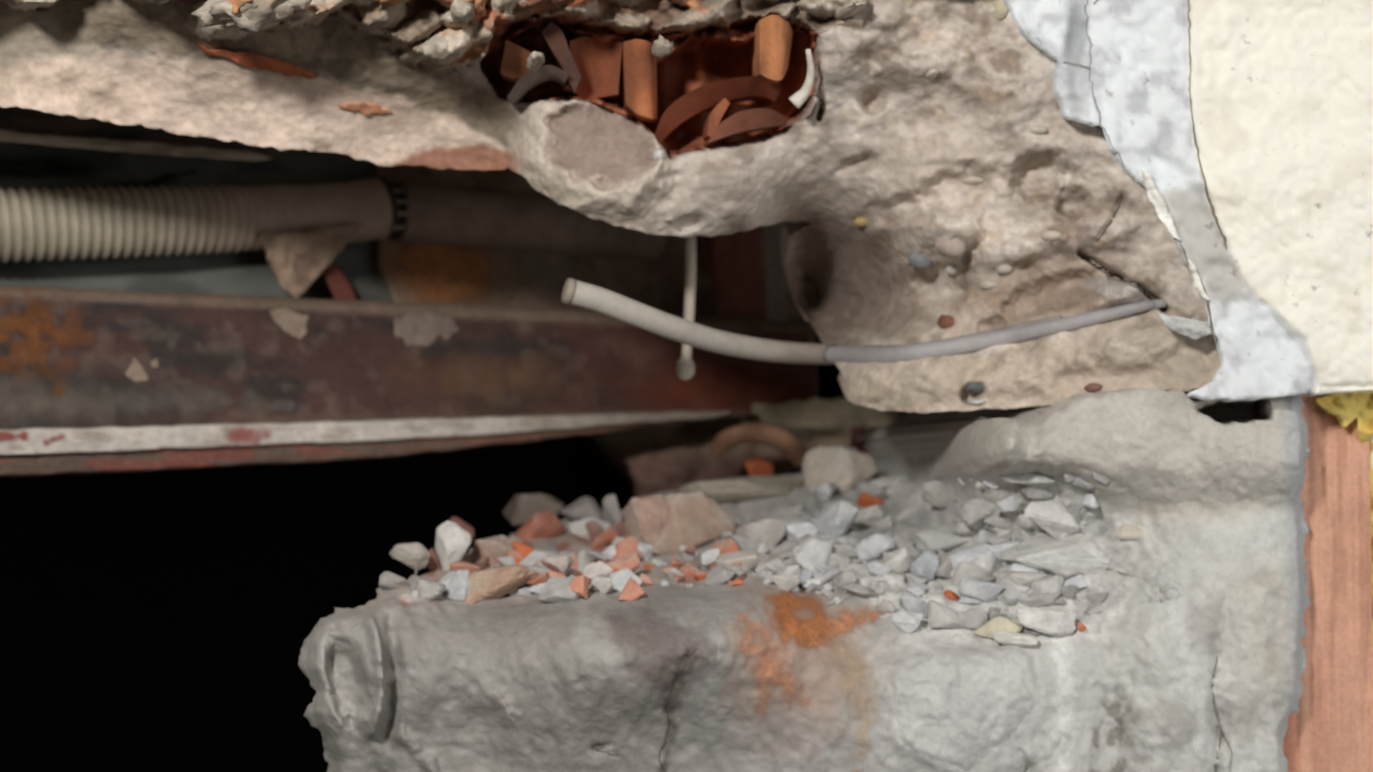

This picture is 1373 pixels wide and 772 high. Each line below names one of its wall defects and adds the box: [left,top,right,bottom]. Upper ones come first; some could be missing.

rust [0,304,81,372]
spalling [0,0,1221,414]
crack [1063,0,1162,310]
crack [1179,241,1219,356]